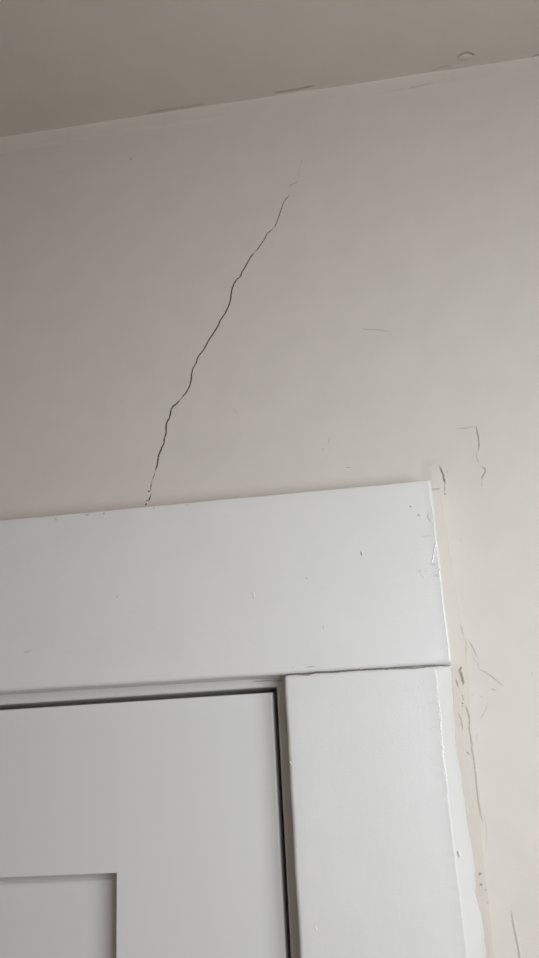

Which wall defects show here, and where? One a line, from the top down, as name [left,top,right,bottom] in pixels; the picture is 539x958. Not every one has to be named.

crack [145,182,296,505]